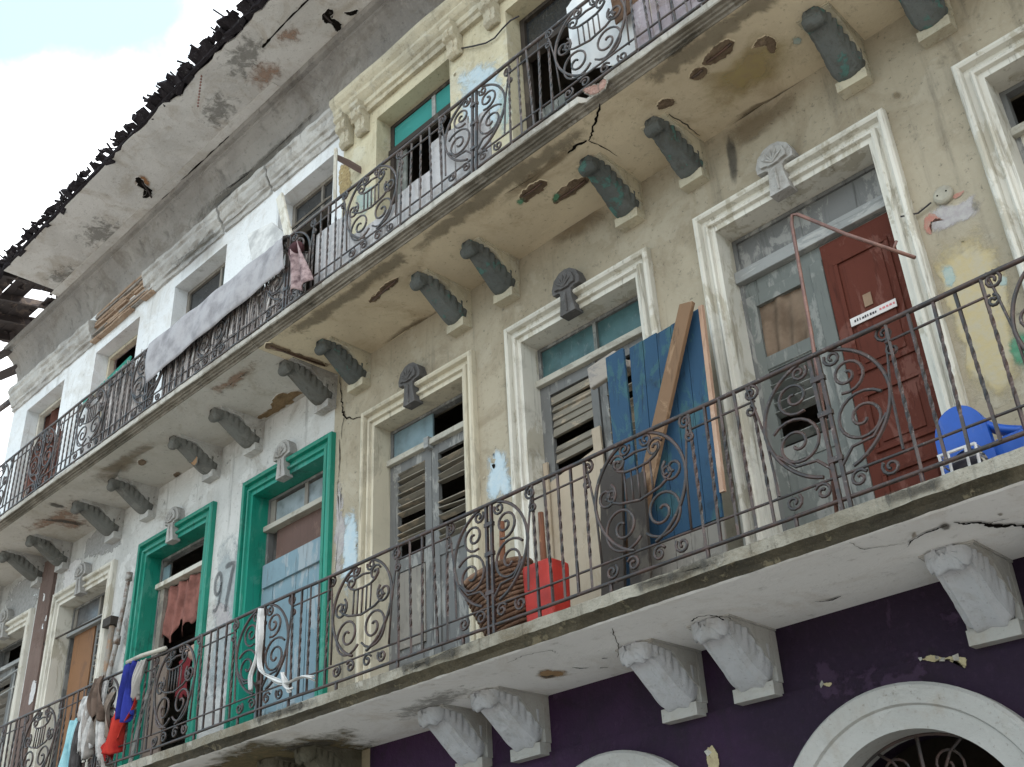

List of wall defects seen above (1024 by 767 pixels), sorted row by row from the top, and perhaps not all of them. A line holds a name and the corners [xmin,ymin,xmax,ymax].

spalling [688,38,736,81]
spalling [750,33,778,54]
spalling [0,0,268,279]
crack [568,104,617,156]
spalling [517,177,590,205]
flaking render [90,274,156,344]
spalling [257,390,303,420]
crack [338,382,360,477]
peeling [482,451,511,499]
crack [852,519,1024,550]
peeling [918,654,967,668]
peeling [704,745,719,767]